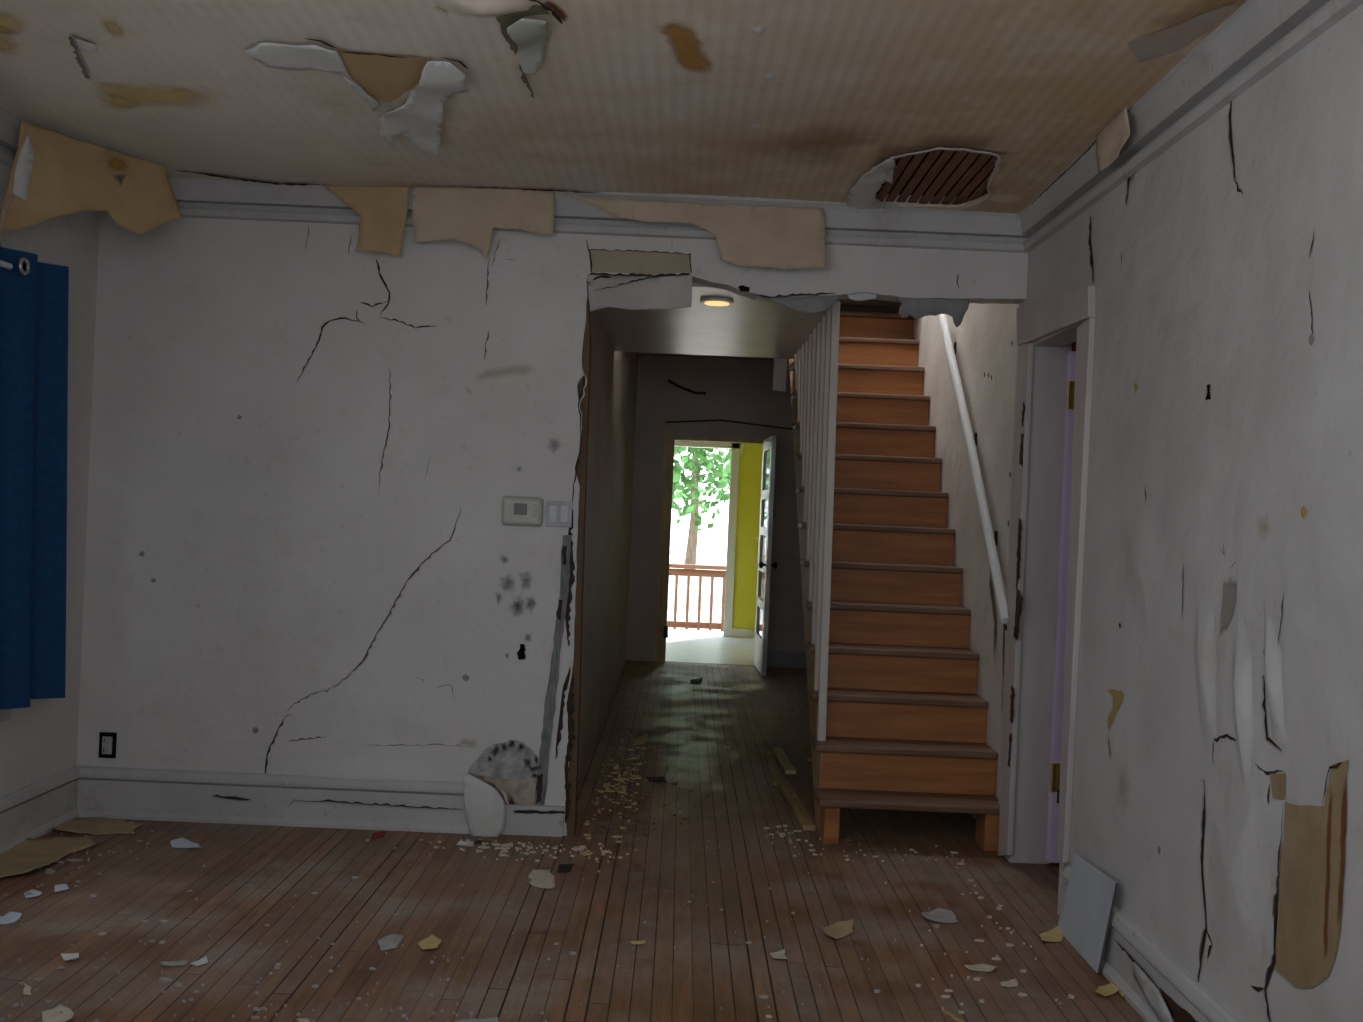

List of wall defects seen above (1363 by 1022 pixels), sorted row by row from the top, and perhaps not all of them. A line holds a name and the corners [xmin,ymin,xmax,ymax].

peeling [430,0,566,98]
peeling [847,158,896,209]
crack [1227,101,1243,194]
crack [297,236,434,382]
crack [379,368,393,493]
crack [213,509,466,800]
crack [289,799,462,810]
flaking render [456,740,539,845]
crack [1196,675,1283,981]
flaking render [1270,760,1348,988]
crack [1251,876,1278,1022]